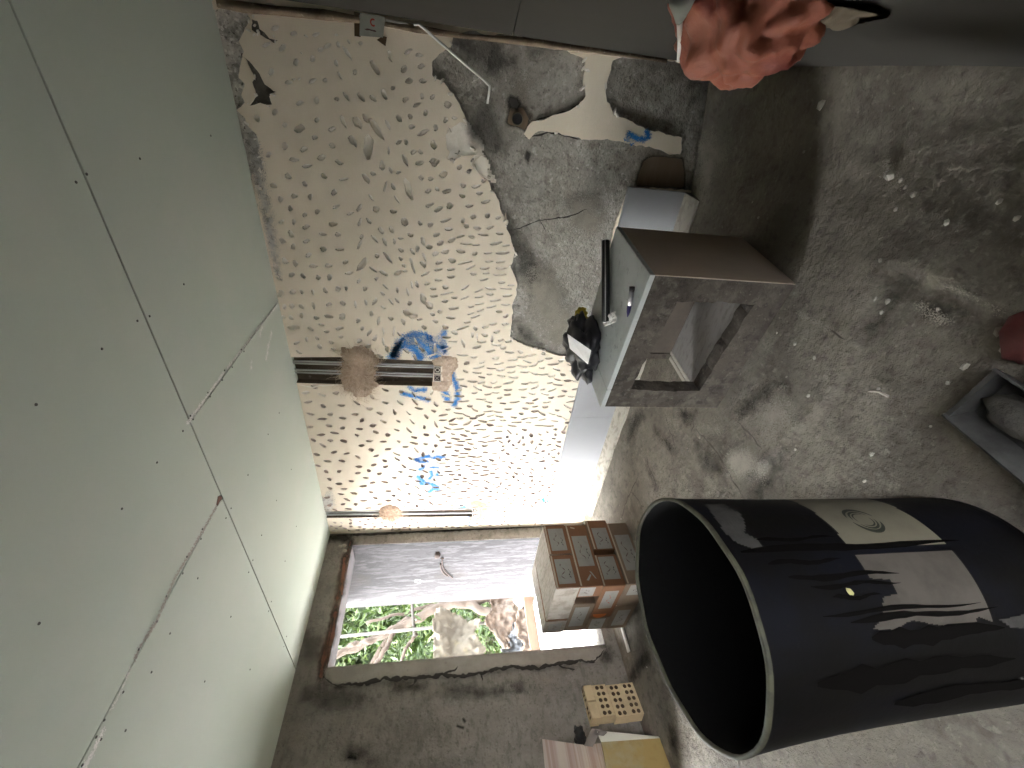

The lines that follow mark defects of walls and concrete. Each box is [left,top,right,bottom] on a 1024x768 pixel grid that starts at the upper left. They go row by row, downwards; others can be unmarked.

crack [514,209,586,231]
spalling [215,9,706,532]
crack [324,650,604,687]